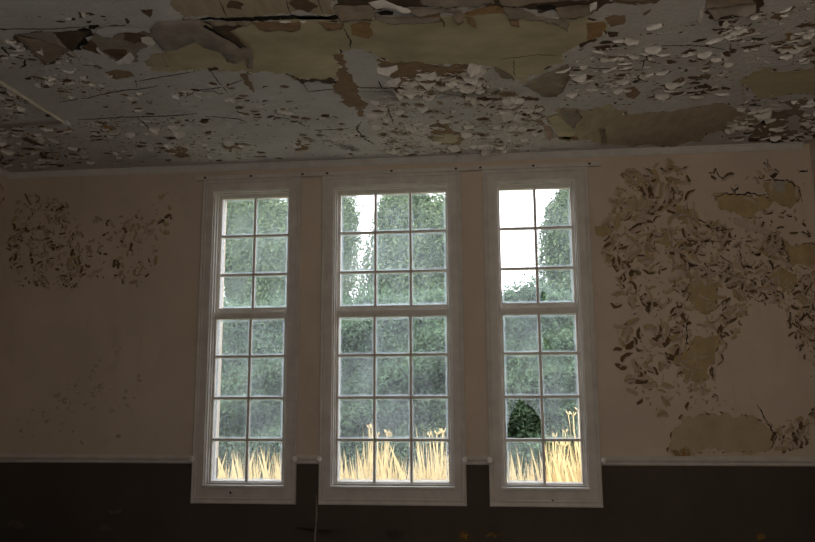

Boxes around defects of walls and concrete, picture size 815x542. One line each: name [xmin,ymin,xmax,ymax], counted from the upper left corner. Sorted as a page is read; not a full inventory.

peeling [0,0,815,169]
peeling [0,184,174,290]
peeling [594,158,815,456]